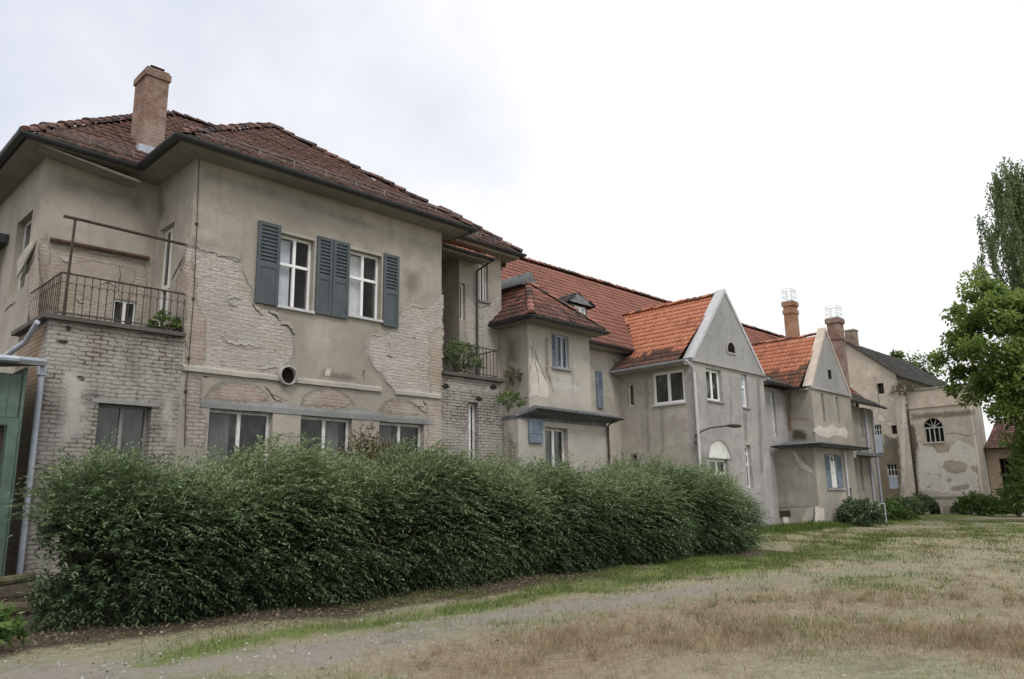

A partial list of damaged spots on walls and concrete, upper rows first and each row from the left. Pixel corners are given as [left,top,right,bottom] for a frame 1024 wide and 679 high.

peeling [17,236,148,343]
peeling [175,244,449,460]
peeling [814,423,848,438]
peeling [876,395,981,514]